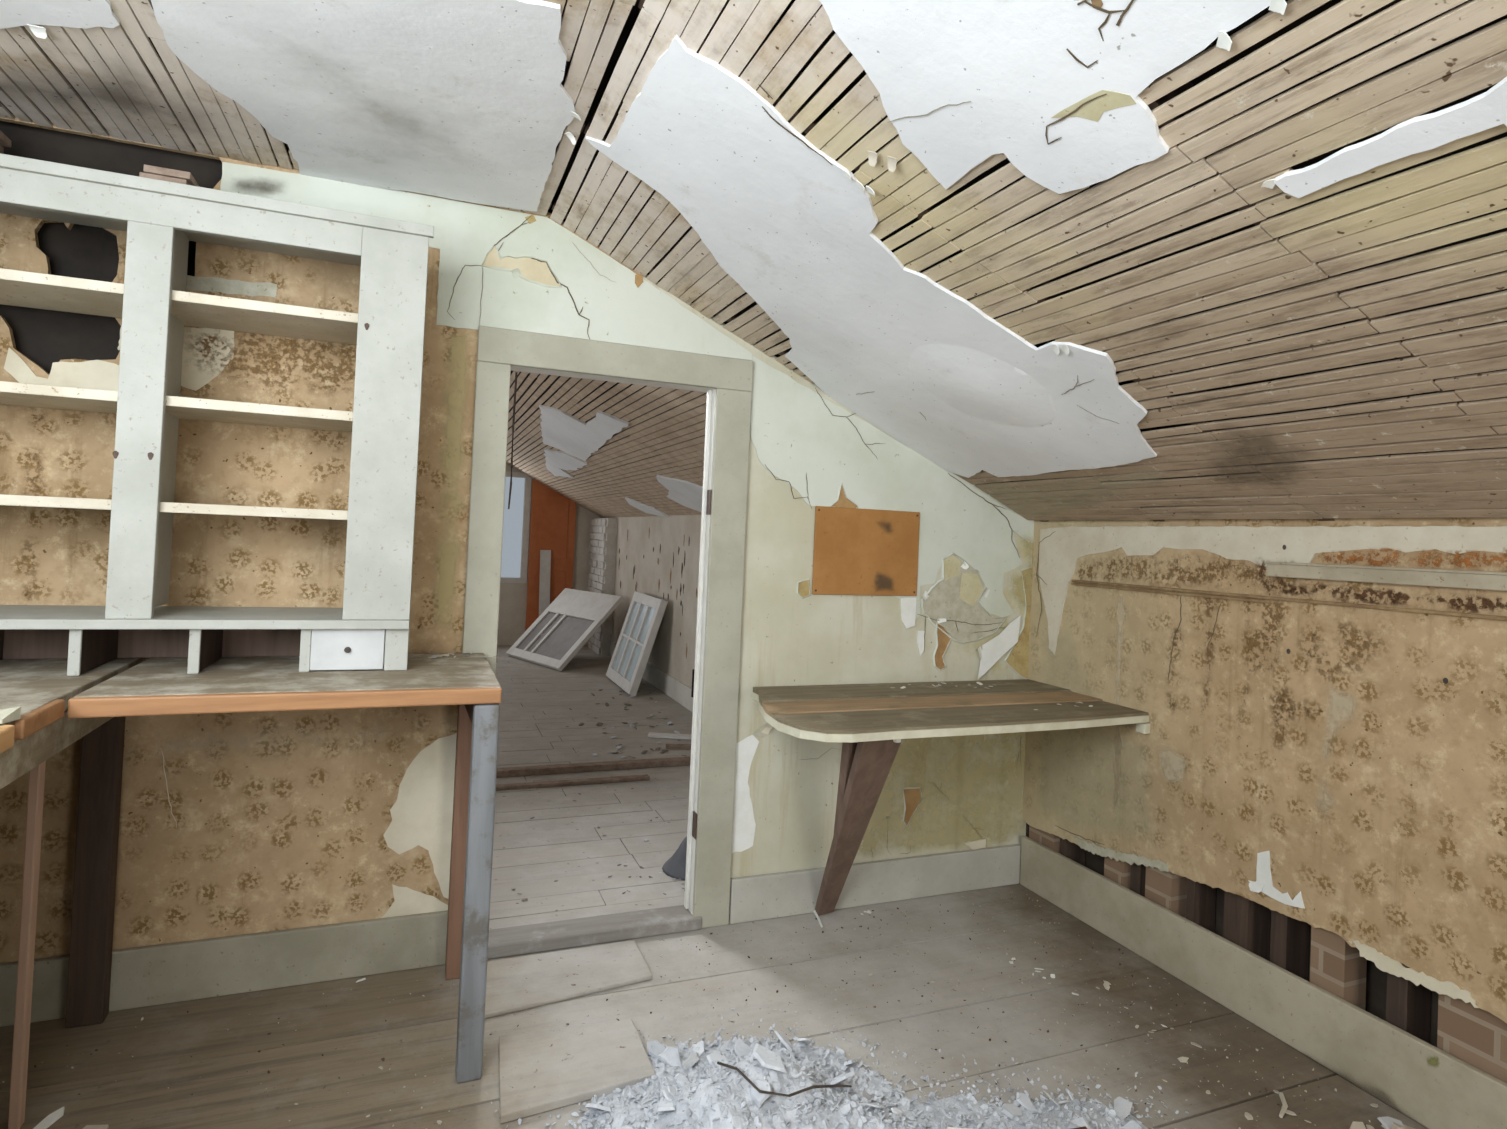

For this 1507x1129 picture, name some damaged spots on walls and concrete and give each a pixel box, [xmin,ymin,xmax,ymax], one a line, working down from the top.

flaking render [0,0,299,189]
crack [1045,0,1134,145]
spalling [37,222,119,282]
spalling [187,241,196,276]
crack [447,216,614,339]
spalling [0,304,122,374]
flaking render [481,0,1507,679]
peeling [732,723,774,853]
peeling [1073,836,1169,876]
spalling [1215,888,1224,937]
peeling [1248,880,1264,893]
peeling [1349,940,1480,1047]